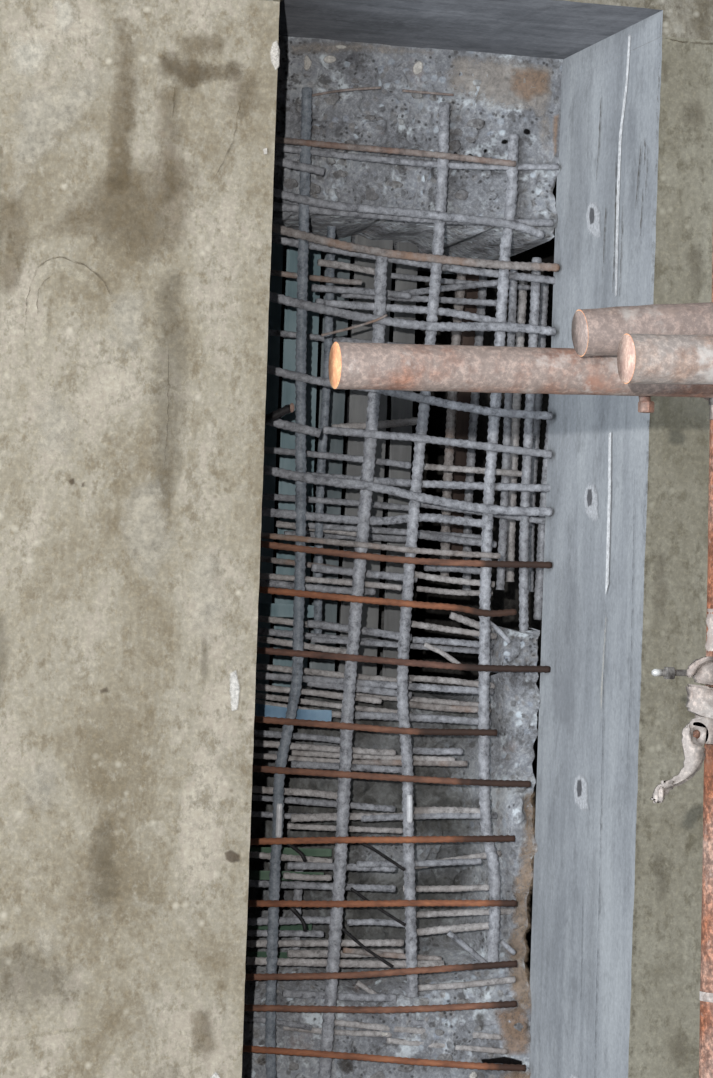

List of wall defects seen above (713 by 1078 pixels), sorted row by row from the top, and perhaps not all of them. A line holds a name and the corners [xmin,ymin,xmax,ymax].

spalling [242,35,563,1078]
corrosion [499,799,534,1052]